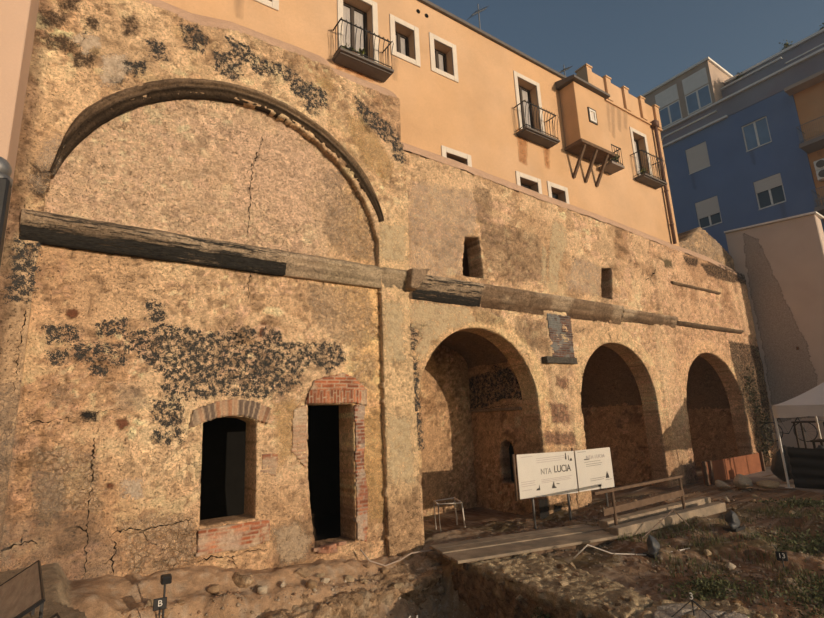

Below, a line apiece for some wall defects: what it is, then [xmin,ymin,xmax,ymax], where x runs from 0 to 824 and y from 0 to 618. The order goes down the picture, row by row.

crack [247,137,268,235]
peeling [729,233,817,453]
crack [30,408,122,424]
crack [65,438,193,576]